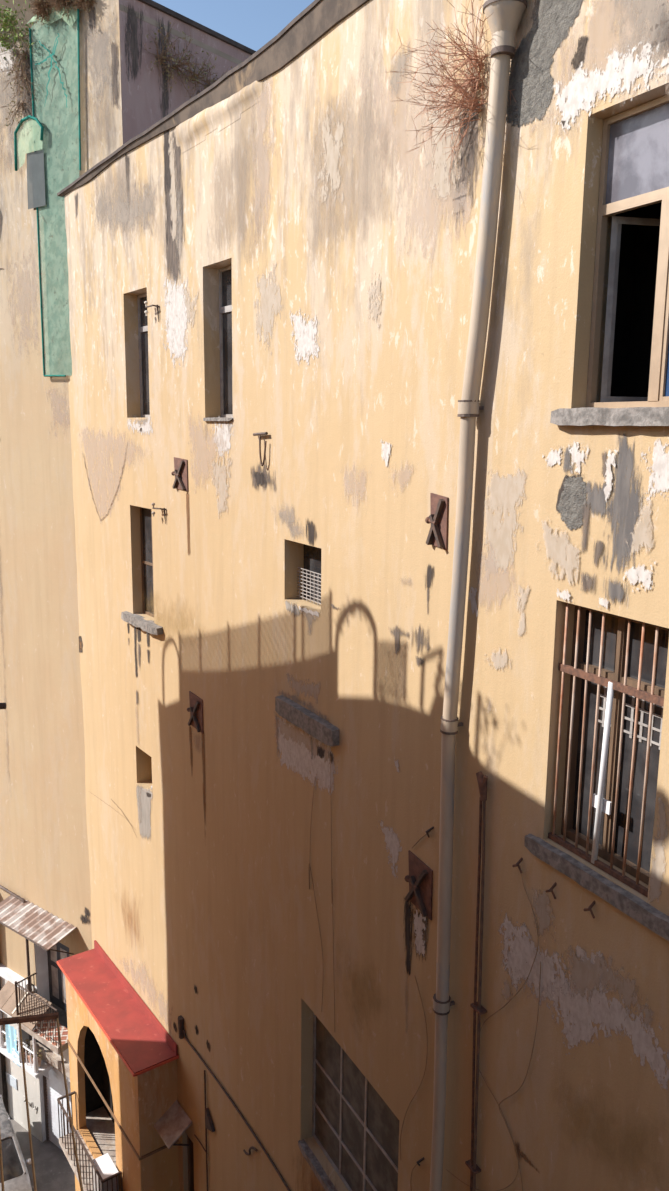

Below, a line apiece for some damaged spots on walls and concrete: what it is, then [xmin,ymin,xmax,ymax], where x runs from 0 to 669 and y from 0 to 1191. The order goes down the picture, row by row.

damp [86,4,143,107]
flaking render [506,0,669,133]
damp [156,21,185,280]
peeling [254,263,320,366]
peeling [381,439,392,467]
flaking render [484,468,527,580]
flaking render [538,442,589,601]
flaking render [604,449,618,502]
flaking render [623,440,669,592]
flaking render [469,587,477,617]
flaking render [274,716,338,794]
flaking render [498,889,669,1091]